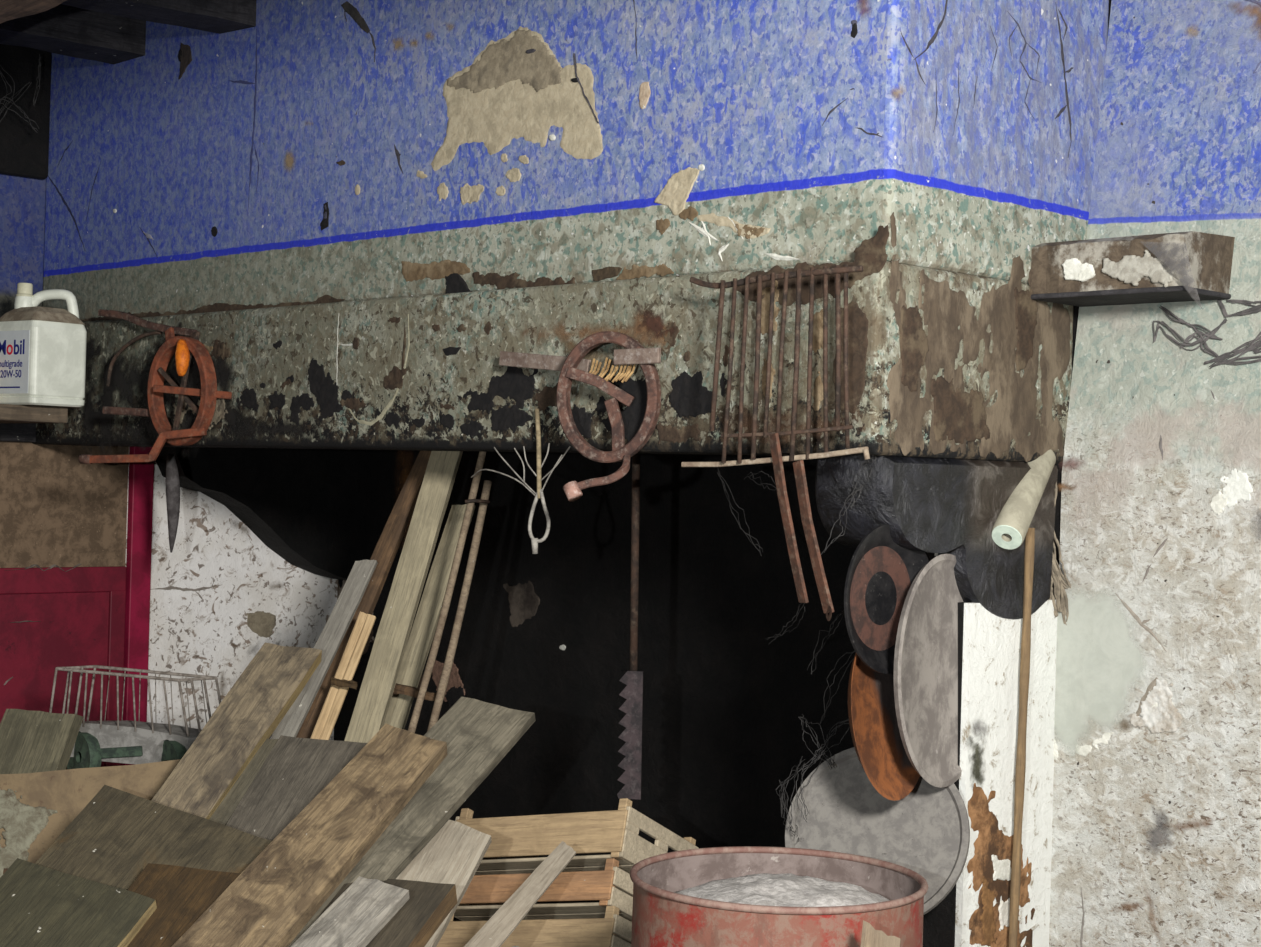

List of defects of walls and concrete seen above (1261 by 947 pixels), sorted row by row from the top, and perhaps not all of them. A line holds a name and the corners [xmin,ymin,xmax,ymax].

spalling [416,26,603,205]
spalling [654,164,771,261]
peeling [209,390,228,430]
peeling [240,358,366,427]
peeling [383,366,407,390]
peeling [384,412,425,429]
spalling [967,783,1035,947]